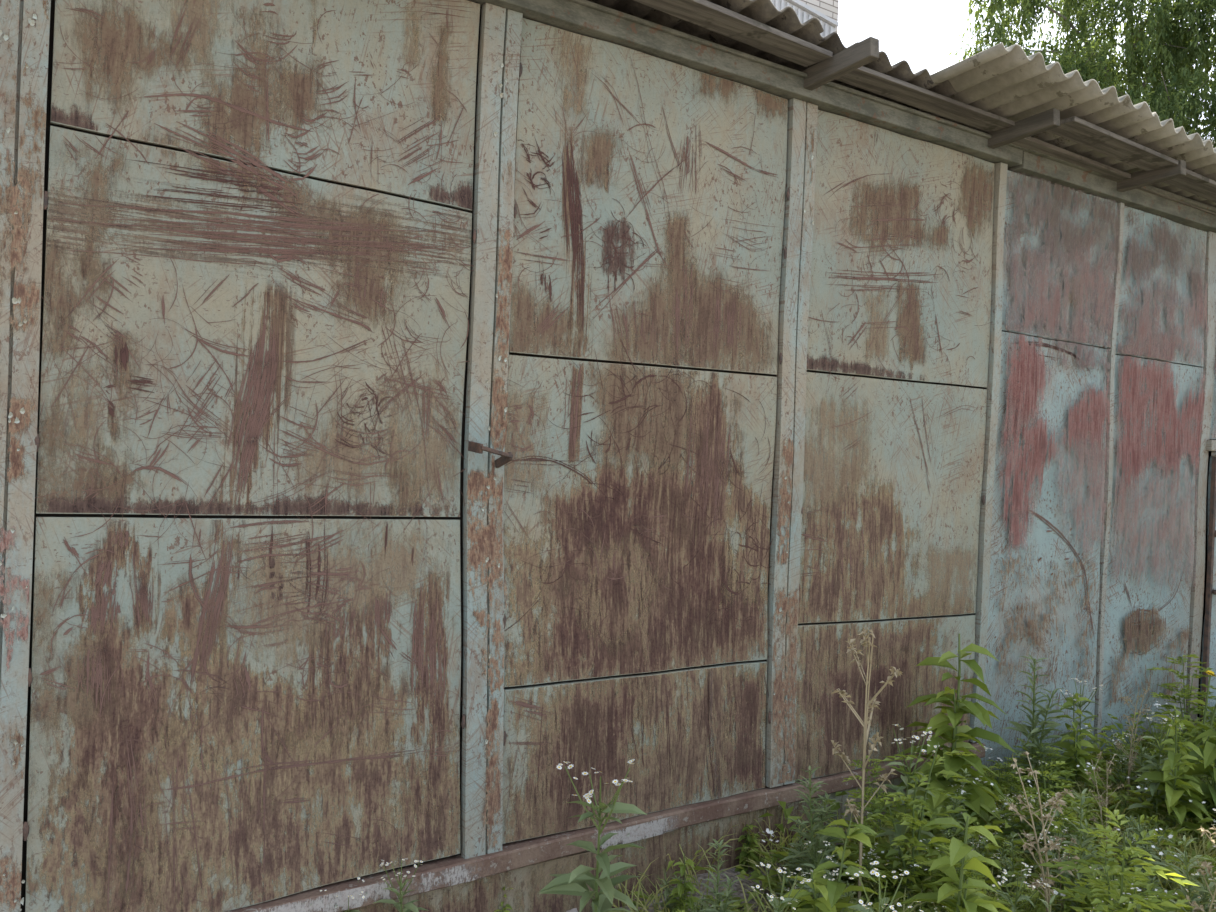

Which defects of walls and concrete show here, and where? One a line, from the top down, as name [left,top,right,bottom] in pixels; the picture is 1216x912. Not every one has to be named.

corrosion [51,2,190,131]
corrosion [282,64,323,130]
corrosion [431,26,450,122]
corrosion [849,181,949,250]
corrosion [958,163,994,235]
corrosion [807,282,925,381]
corrosion [503,126,771,843]
peeling [988,267,1216,693]
corrosion [26,288,460,912]
corrosion [795,400,975,781]
corrosion [1123,606,1166,655]
corrosion [349,797,839,912]